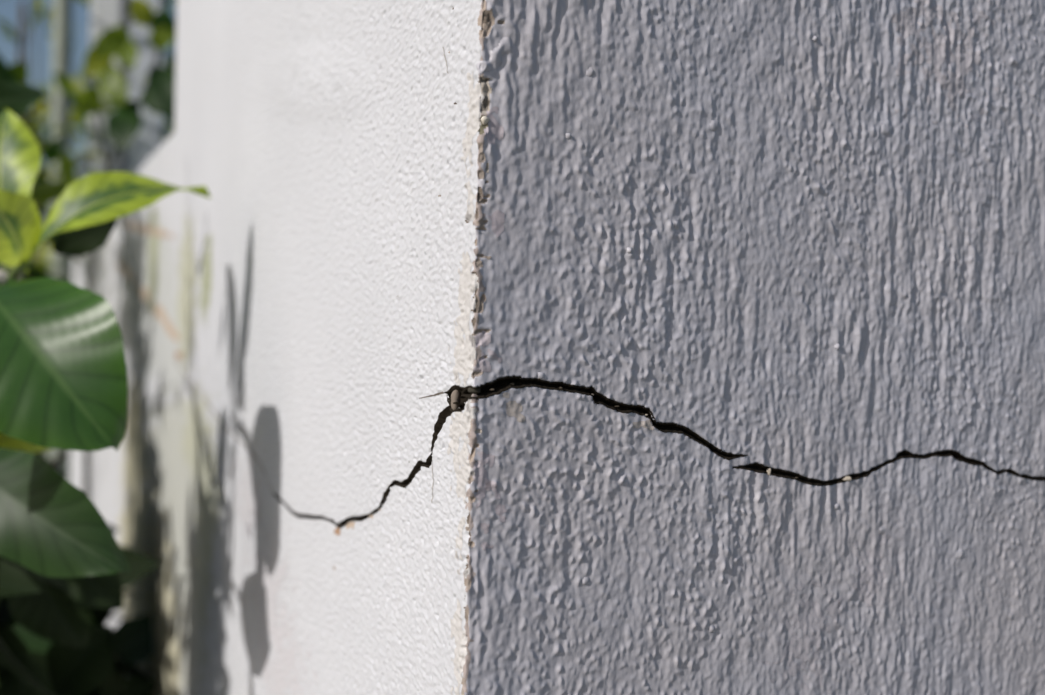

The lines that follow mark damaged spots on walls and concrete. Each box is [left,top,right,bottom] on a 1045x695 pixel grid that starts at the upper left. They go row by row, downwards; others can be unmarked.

crack [272,375,1045,529]